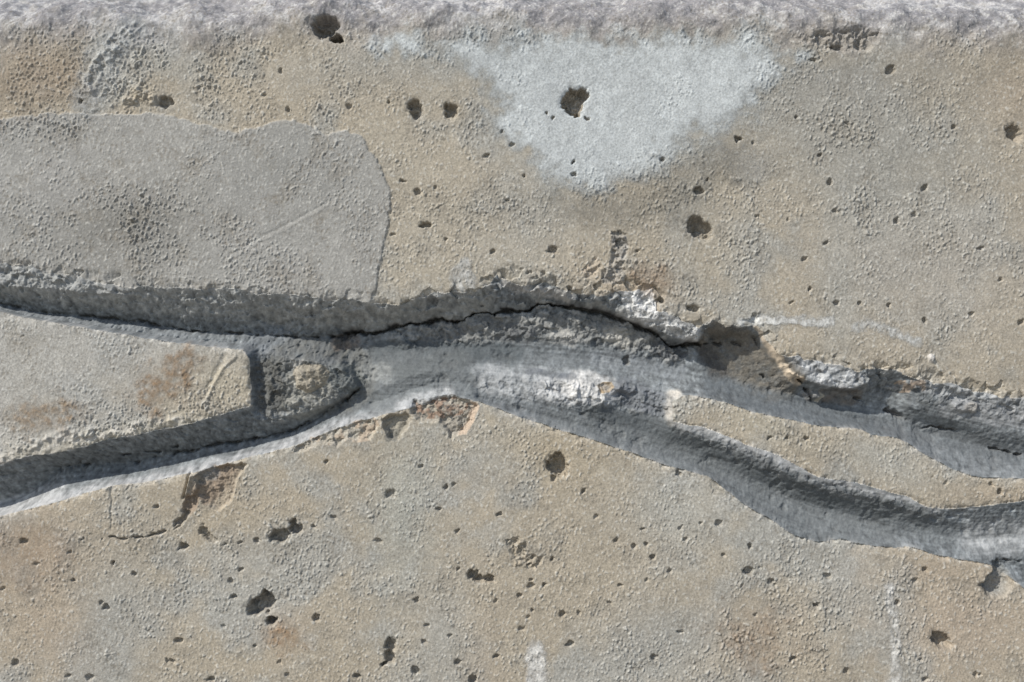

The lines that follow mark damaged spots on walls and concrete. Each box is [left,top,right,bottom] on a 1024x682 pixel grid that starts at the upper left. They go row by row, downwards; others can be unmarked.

efflorescence [369,27,782,194]
spalling [581,230,801,392]
peeling [0,411,193,465]
spalling [248,346,363,421]
spalling [292,394,480,454]
crack [0,263,1024,588]
spalling [101,461,250,542]
spalling [504,534,547,572]